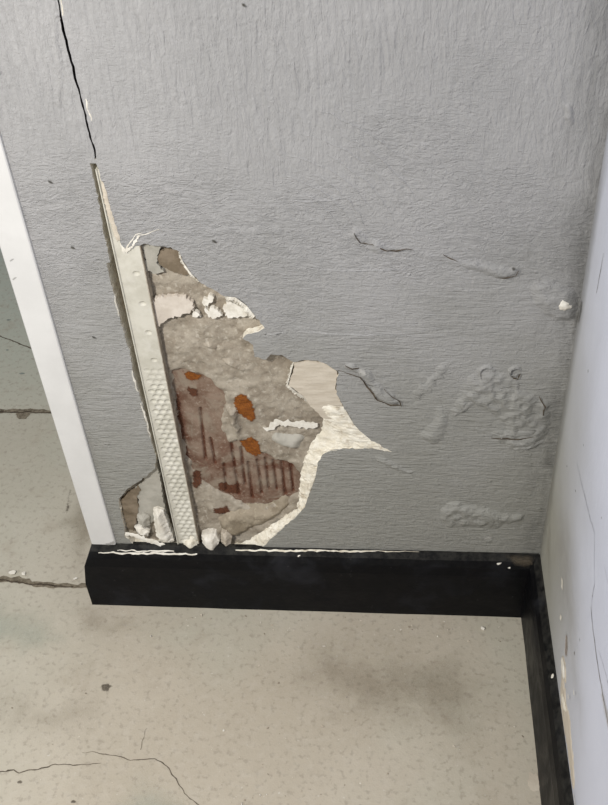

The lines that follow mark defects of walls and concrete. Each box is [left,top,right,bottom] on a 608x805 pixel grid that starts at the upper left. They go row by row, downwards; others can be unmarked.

crack [48,0,96,158]
flaking render [98,181,416,557]
crack [0,579,73,588]
crack [0,734,199,805]